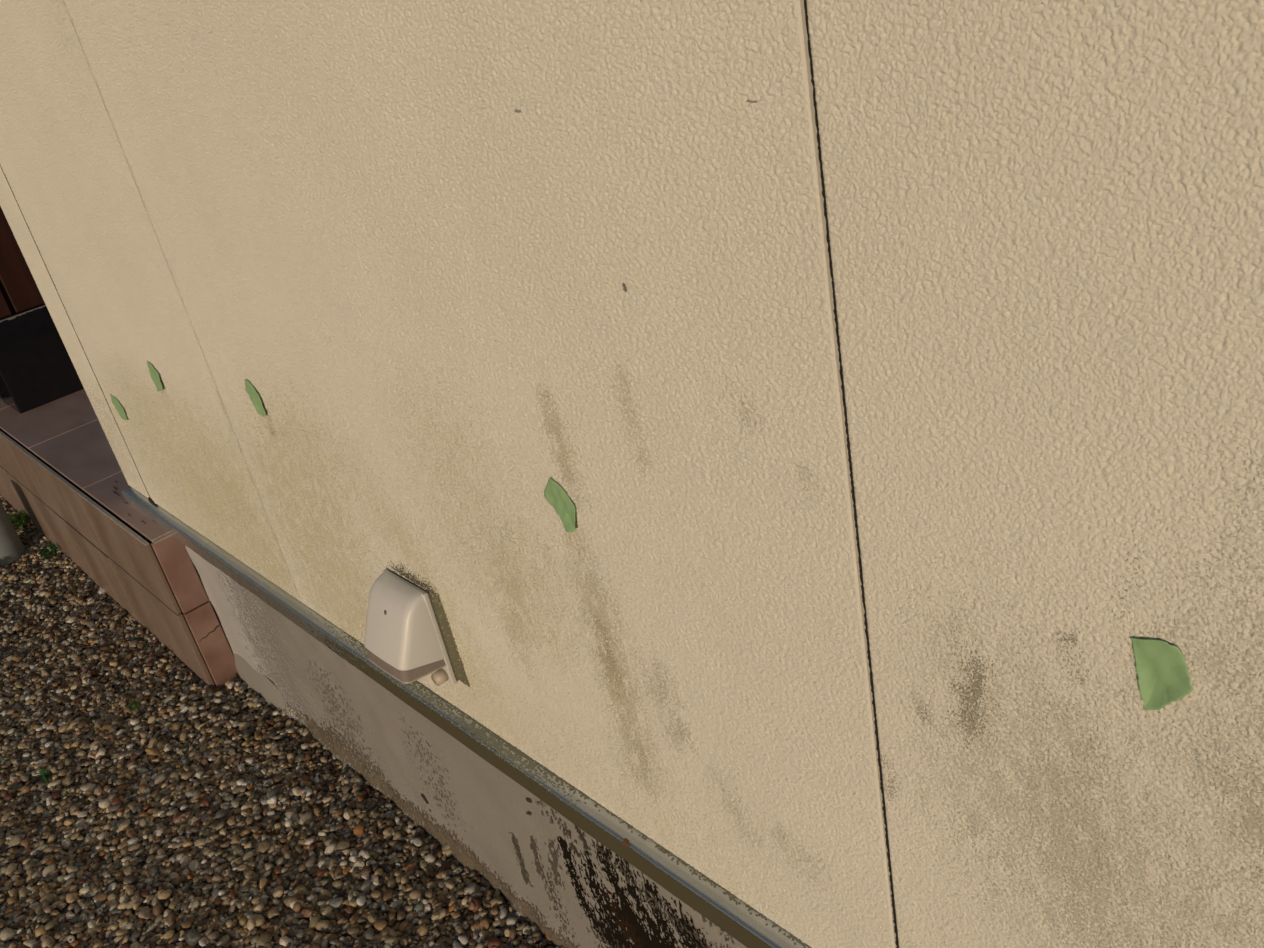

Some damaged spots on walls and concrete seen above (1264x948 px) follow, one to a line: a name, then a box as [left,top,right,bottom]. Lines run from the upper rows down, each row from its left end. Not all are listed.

mould [911,628,1002,761]
water stain [1052,624,1088,688]
water stain [509,800,734,948]